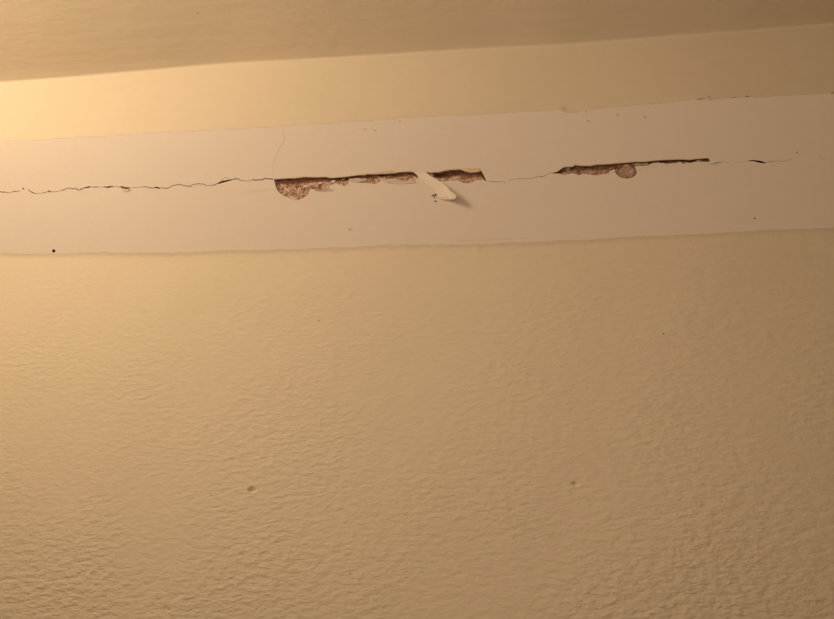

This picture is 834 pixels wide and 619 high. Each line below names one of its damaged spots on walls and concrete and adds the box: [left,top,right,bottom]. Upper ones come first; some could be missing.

crack [0,134,284,194]
spalling [274,168,486,201]
spalling [554,157,710,179]